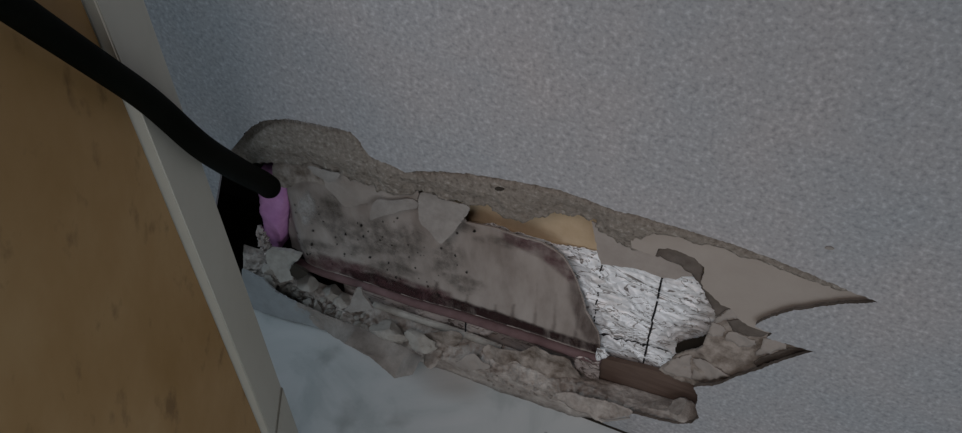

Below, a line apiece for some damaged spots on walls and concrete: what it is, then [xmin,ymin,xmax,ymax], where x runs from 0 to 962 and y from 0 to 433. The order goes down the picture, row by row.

leakage [294,194,599,353]
spalling [242,244,677,423]
spalling [231,119,869,367]
peeling [662,355,730,382]